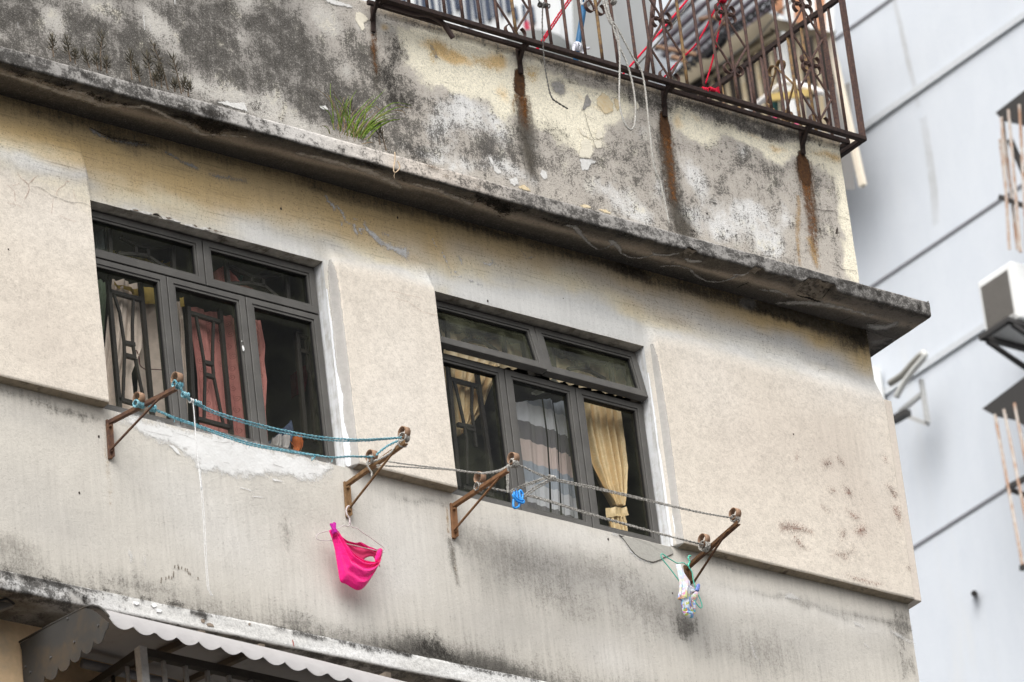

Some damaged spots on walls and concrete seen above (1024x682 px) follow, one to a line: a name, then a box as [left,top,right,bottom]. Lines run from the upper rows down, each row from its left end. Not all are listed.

damp [0,72,247,138]
damp [296,153,473,205]
damp [379,32,420,115]
damp [479,131,504,159]
corrosion [513,68,535,176]
corrosion [659,111,691,237]
damp [712,112,793,143]
corrosion [796,151,819,264]
damp [401,631,499,671]